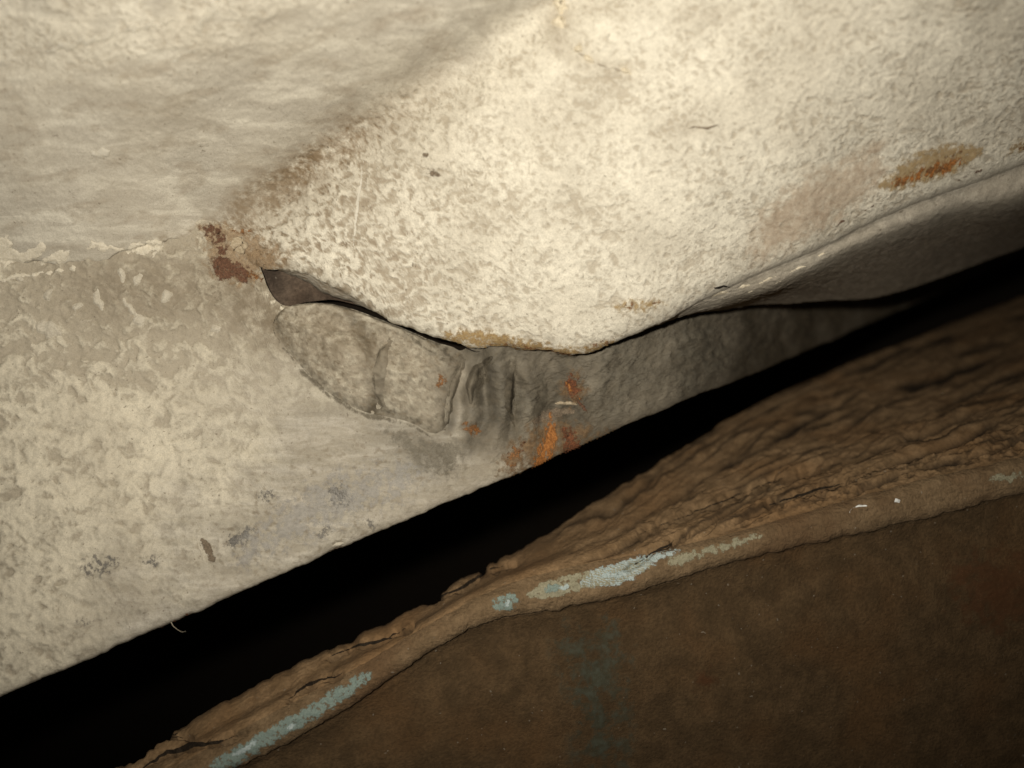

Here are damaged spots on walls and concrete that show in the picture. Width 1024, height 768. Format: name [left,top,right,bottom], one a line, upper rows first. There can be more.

rust [878,144,983,191]
rust [199,223,286,287]
rust [499,413,599,476]
spalling [533,401,577,425]